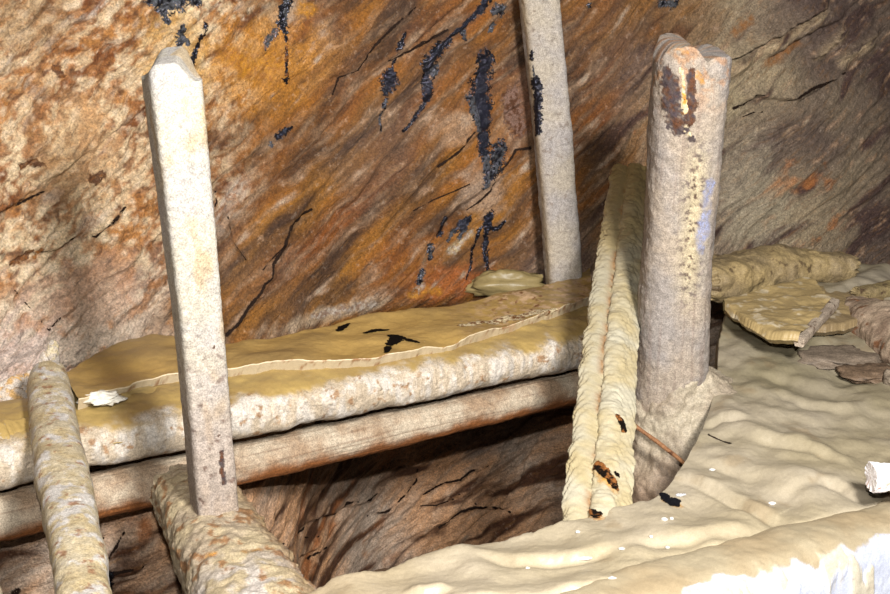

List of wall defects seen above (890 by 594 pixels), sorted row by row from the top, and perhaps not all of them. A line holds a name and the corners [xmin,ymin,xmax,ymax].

damp [230,0,315,84]
damp [377,31,407,132]
damp [402,0,507,132]
damp [465,48,508,191]
damp [529,50,544,137]
crack [1,191,45,212]
crack [215,191,313,337]
damp [414,209,506,287]
crack [283,465,511,564]